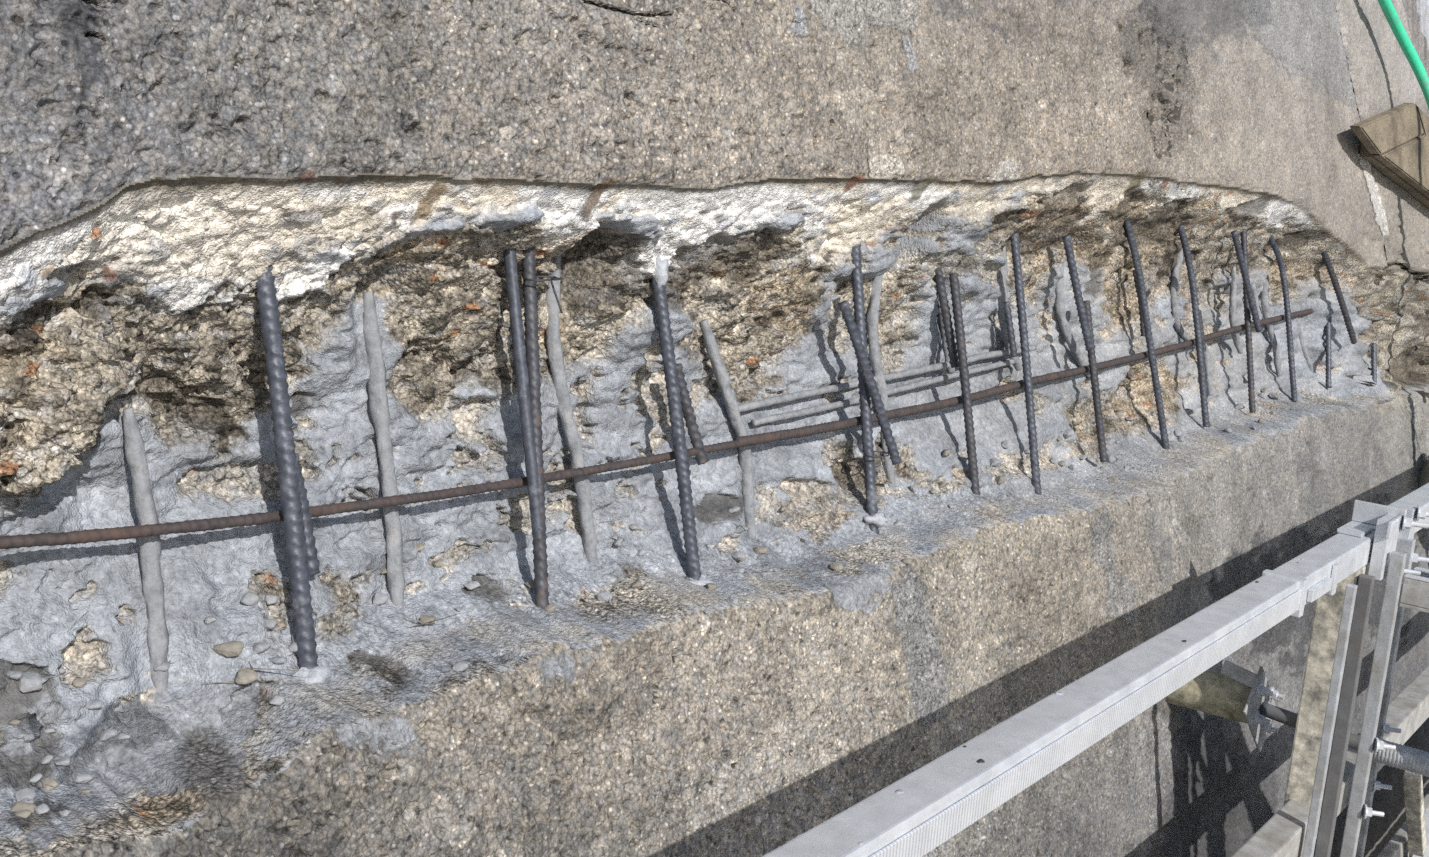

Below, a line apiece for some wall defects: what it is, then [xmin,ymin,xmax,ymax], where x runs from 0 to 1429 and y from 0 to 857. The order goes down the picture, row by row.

crack [582,0,673,27]
spalling [0,154,1429,790]
spalling [0,537,212,857]